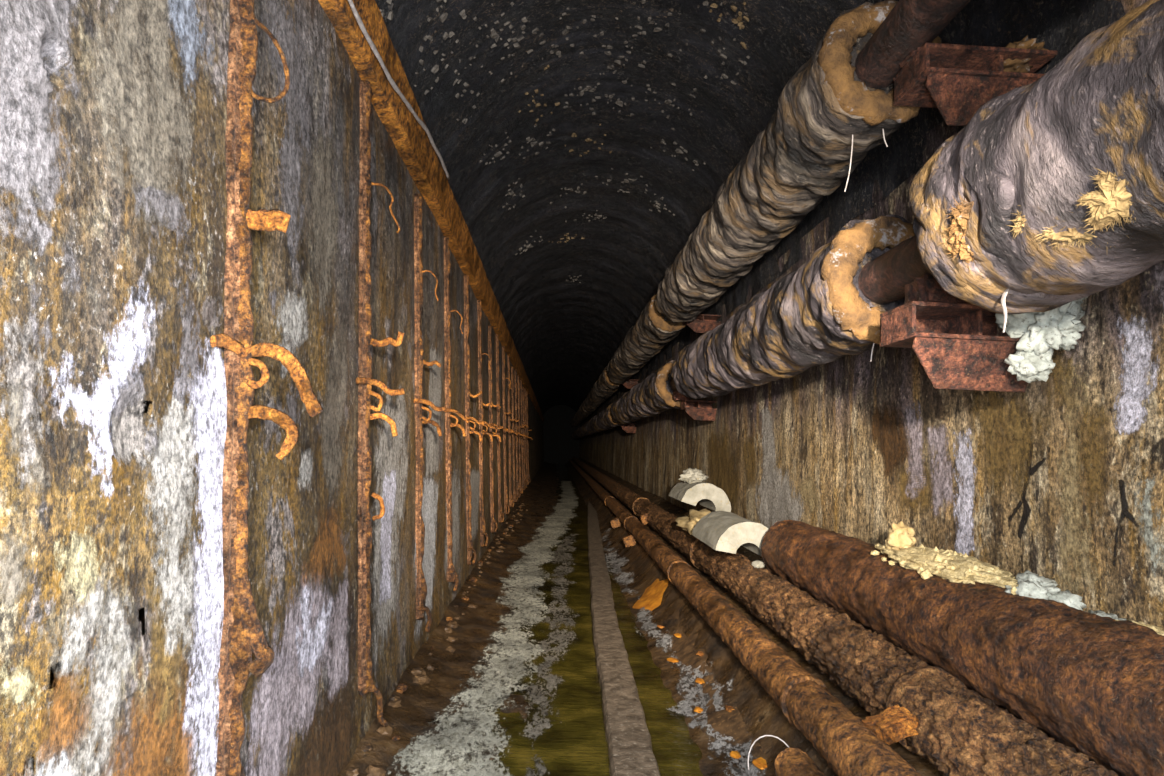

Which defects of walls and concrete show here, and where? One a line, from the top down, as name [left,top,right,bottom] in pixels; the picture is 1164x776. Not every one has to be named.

damp [145,284,227,776]
damp [246,331,357,776]
damp [371,387,409,664]
damp [387,481,580,776]
rust [633,579,669,611]
rust [666,605,765,756]
rust [872,406,929,516]
damp [902,403,977,555]
rust [972,391,1042,489]
crack [1009,442,1046,539]
damp [1047,316,1158,595]
crack [1113,480,1139,566]